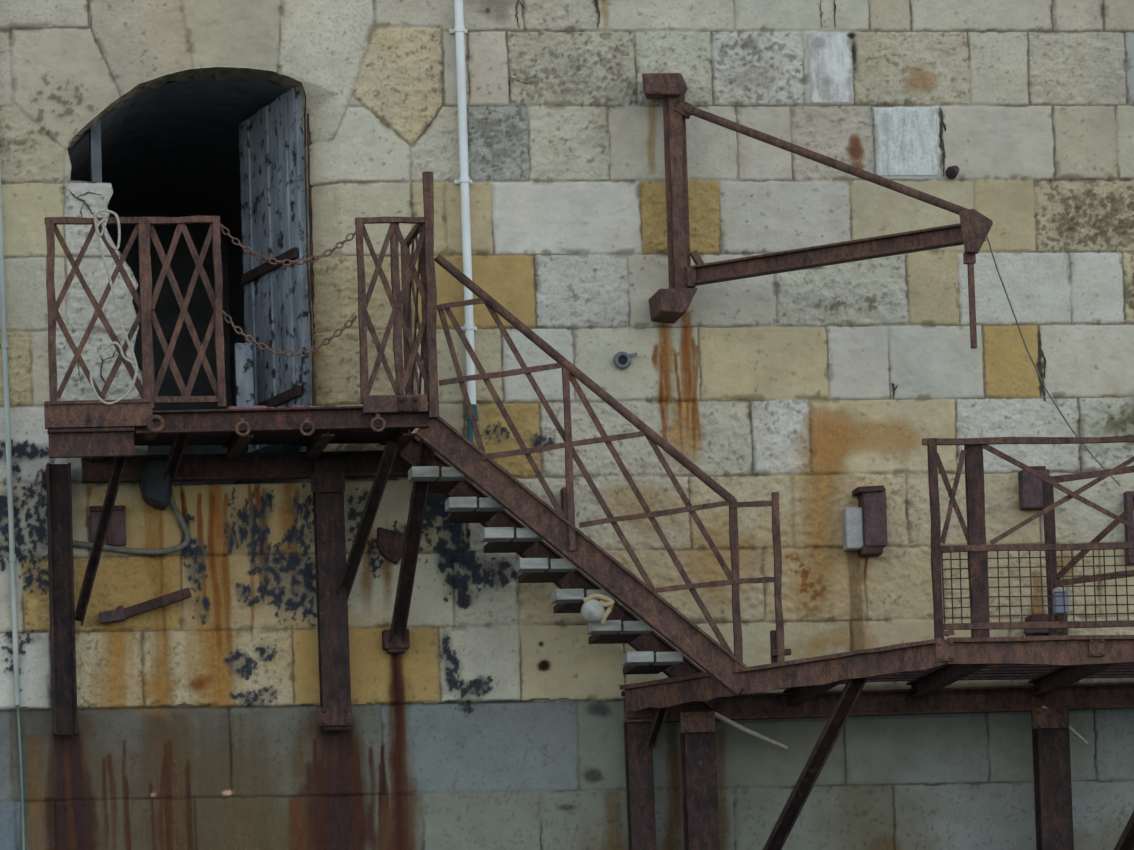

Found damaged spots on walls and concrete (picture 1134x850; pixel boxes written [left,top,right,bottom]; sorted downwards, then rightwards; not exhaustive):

crack [68,189,102,218]
rust [849,134,864,169]
rust [652,312,701,454]
rust [103,622,125,709]
rust [143,485,270,850]
rust [25,728,131,850]
rust [290,653,415,850]